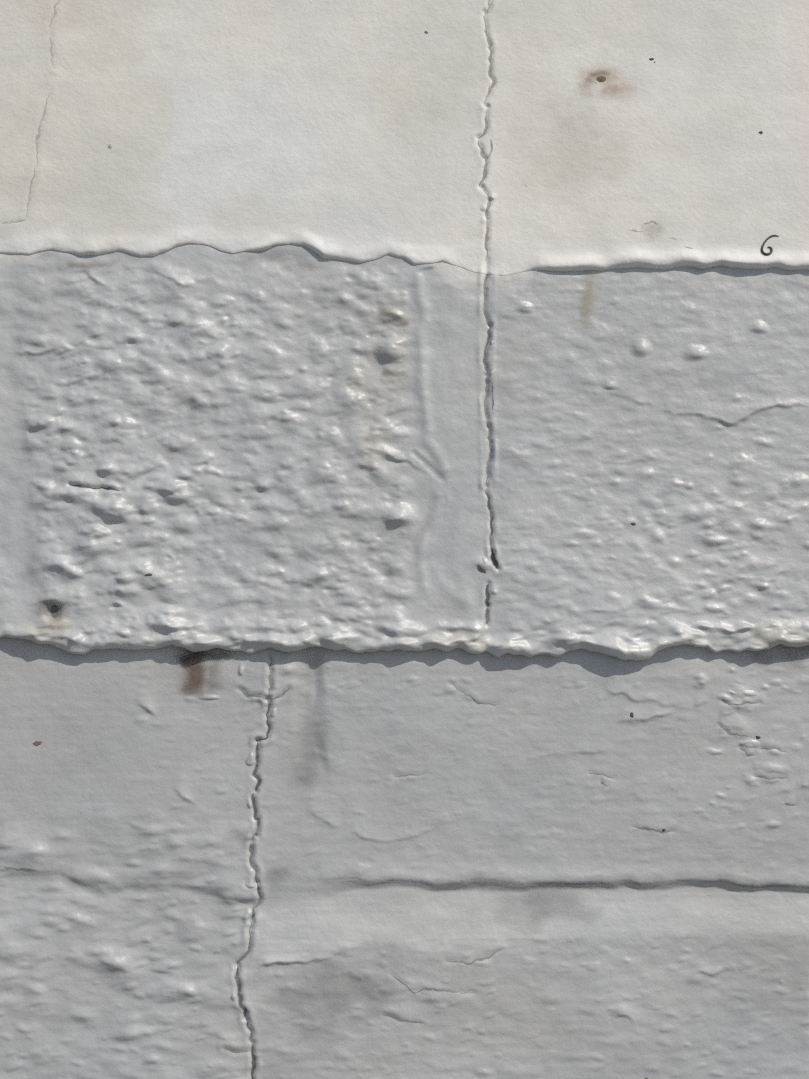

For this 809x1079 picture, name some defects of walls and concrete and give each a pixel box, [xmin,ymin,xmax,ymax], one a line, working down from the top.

crack [478,2,499,623]
crack [228,657,289,1079]